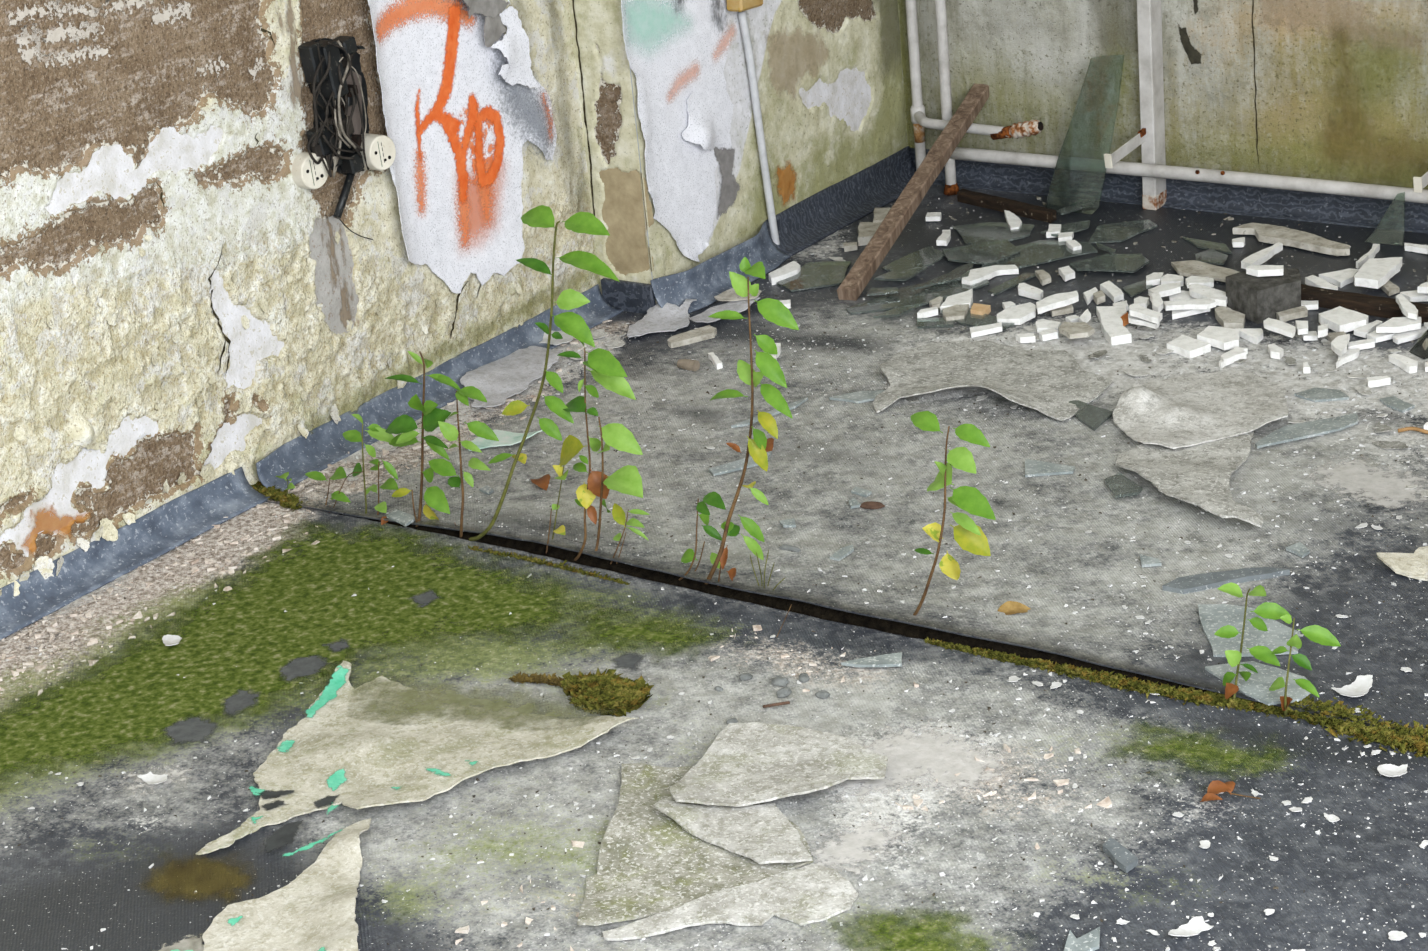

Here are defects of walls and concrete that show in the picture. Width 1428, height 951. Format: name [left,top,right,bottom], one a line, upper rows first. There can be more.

flaking render [798,0,876,34]
crack [1251,0,1259,165]
flaking render [0,0,284,286]
peeling [300,0,557,307]
rust [990,126,1012,140]
peeling [286,258,316,283]
flaking render [0,241,293,596]
peeling [330,403,341,424]
peeling [162,635,182,646]